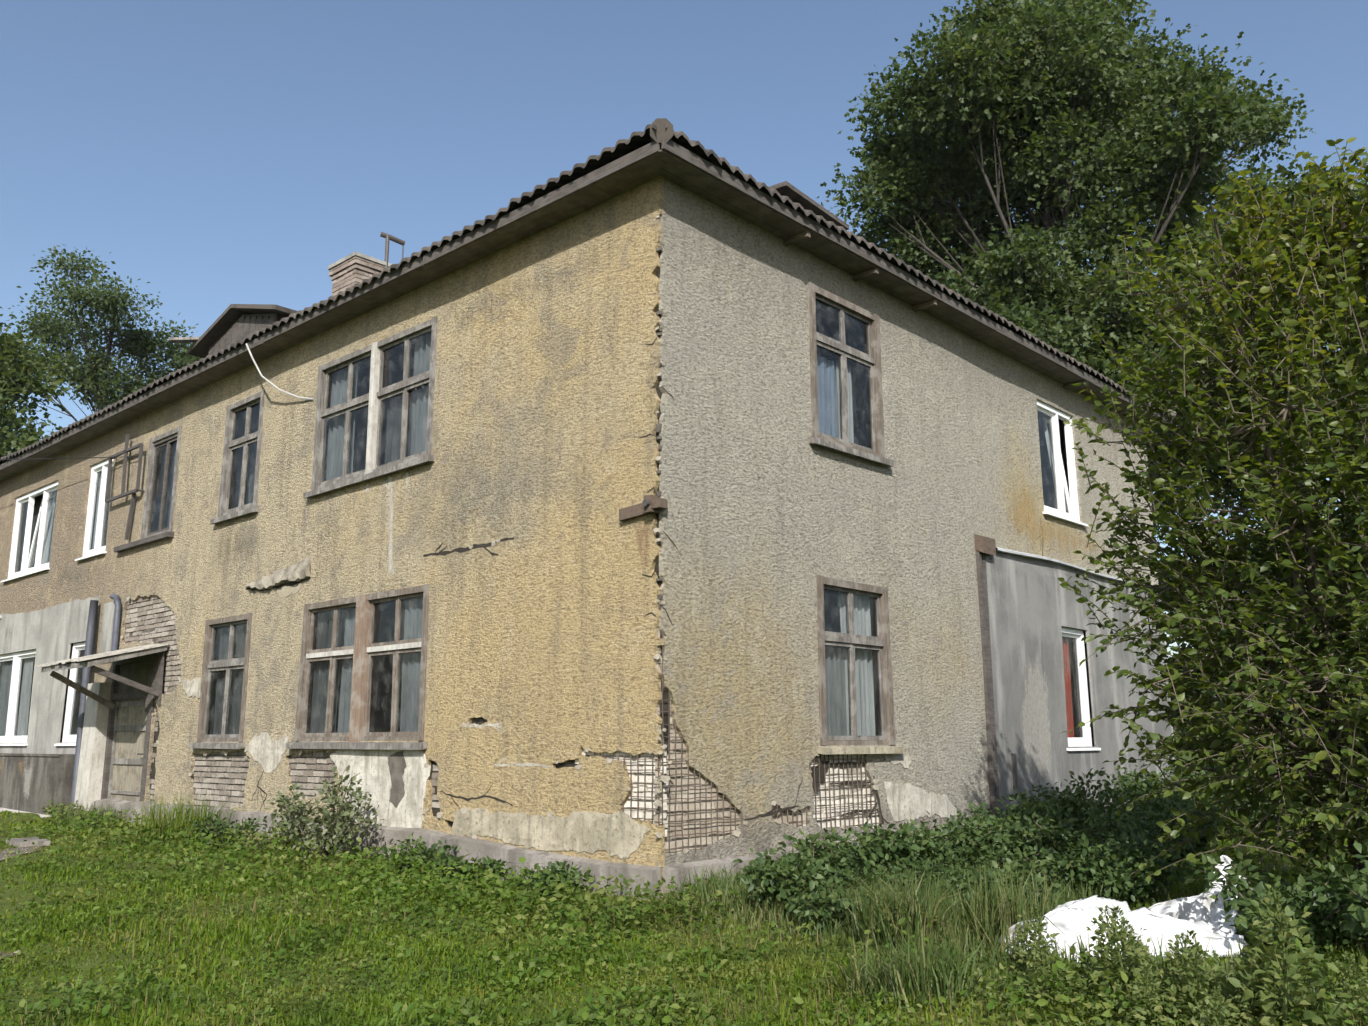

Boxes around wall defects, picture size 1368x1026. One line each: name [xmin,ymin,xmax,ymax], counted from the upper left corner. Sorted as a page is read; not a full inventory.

crack [637,215,678,753]
crack [423,537,514,557]
spalling [121,595,201,694]
spalling [117,662,154,716]
spalling [188,750,250,810]
spalling [289,750,335,800]
crack [440,723,552,807]
spalling [555,629,748,854]